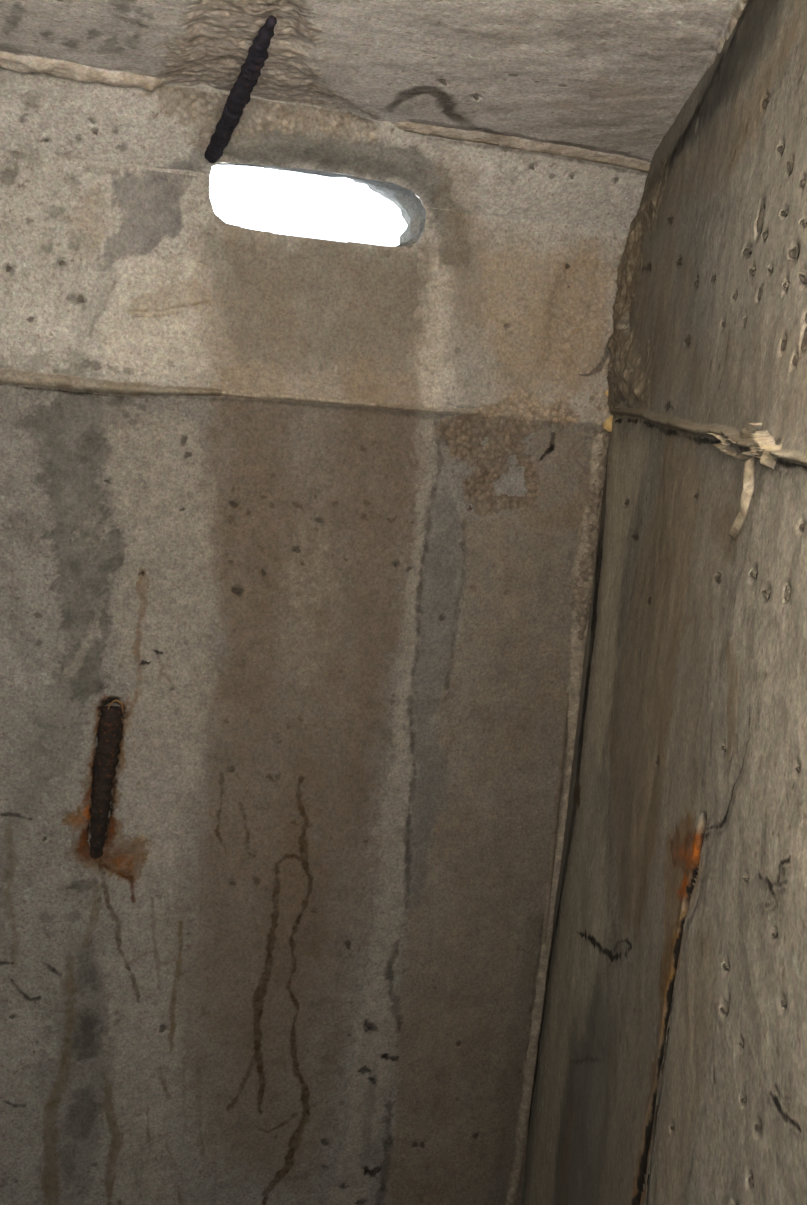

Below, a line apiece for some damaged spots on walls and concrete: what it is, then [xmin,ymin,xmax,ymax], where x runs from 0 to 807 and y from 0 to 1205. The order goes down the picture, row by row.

rust [36,565,185,1004]
water stain [0,132,624,1205]
spalling [432,234,615,526]
crack [523,416,751,1205]
water stain [521,423,778,1205]
water stain [529,0,807,449]